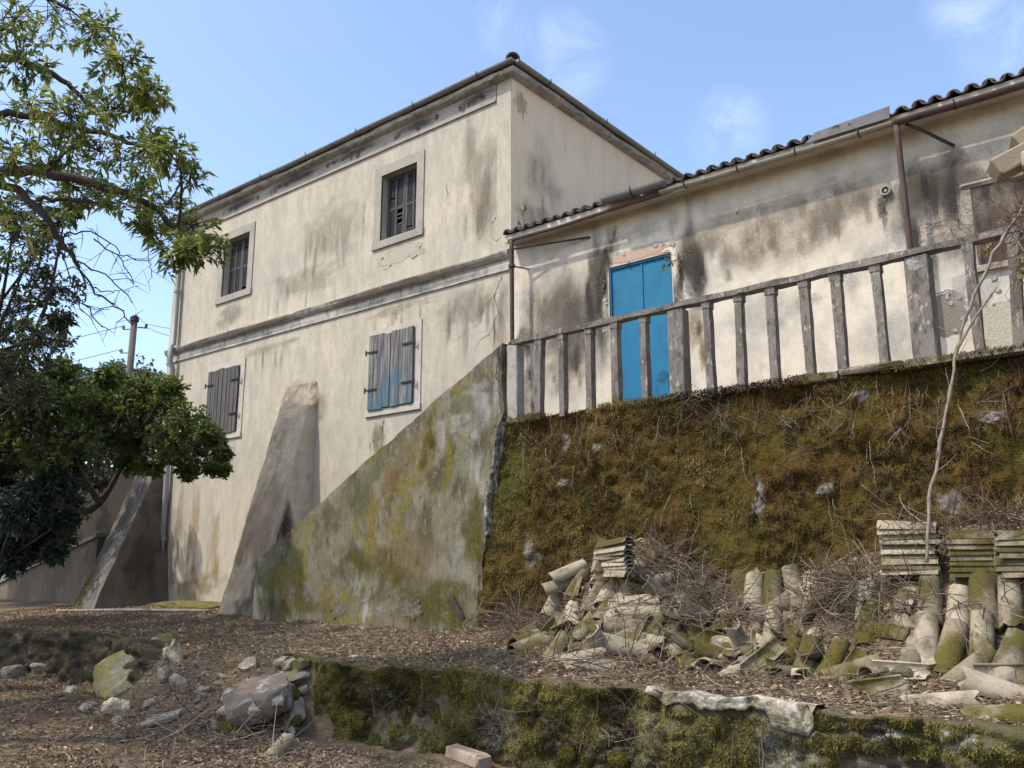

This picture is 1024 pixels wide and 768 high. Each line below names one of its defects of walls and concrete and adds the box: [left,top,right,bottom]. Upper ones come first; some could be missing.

leakage [852,158,1014,248]
spalling [379,242,424,270]
spalling [602,241,676,266]
leakage [674,231,714,302]